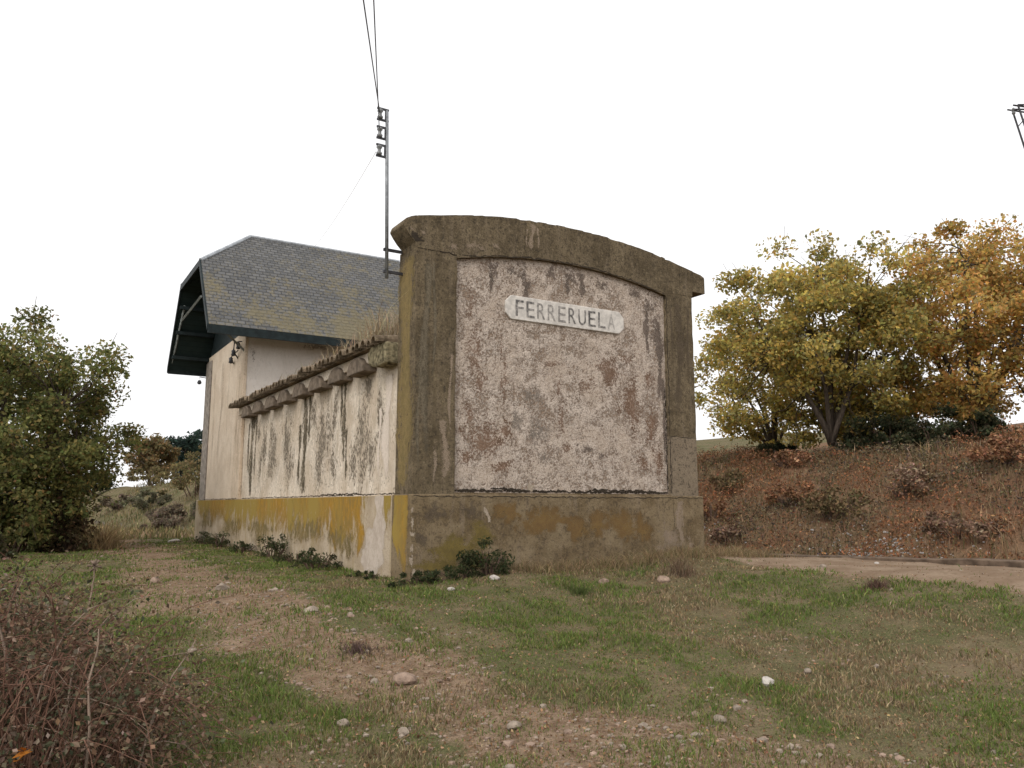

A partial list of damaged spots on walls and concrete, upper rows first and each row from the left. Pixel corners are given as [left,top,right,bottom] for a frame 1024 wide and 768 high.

water stain [210,366,384,558]
peeling [455,287,516,473]
water stain [383,260,690,568]
peeling [544,360,607,458]
peeling [578,351,666,481]